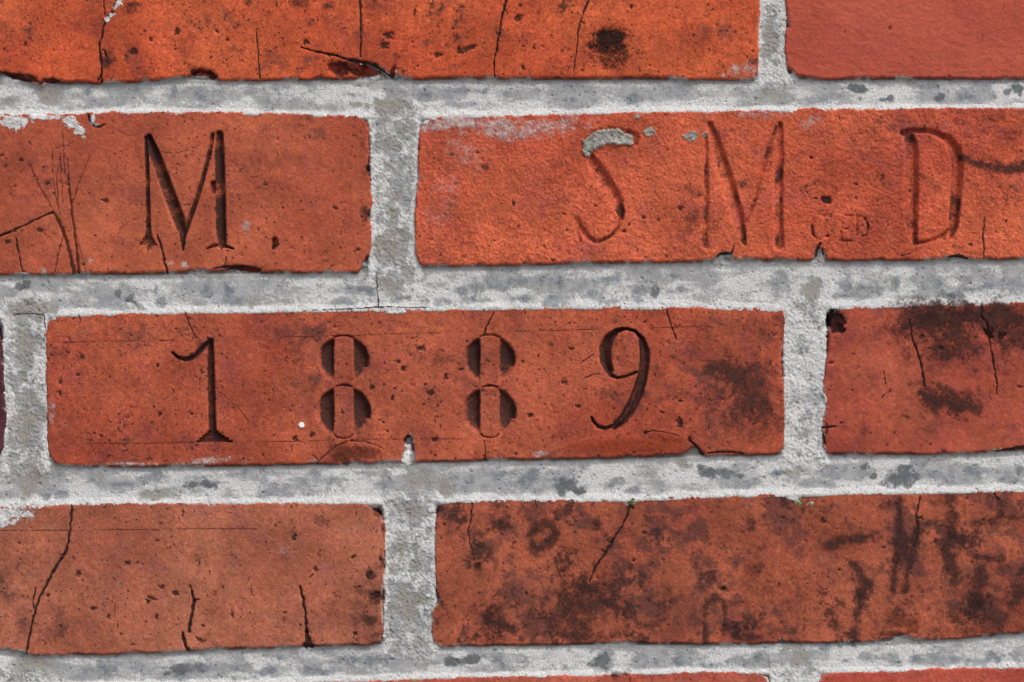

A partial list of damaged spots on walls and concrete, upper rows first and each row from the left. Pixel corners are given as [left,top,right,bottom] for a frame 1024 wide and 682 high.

crack [97,0,117,83]
crack [301,0,391,77]
crack [493,0,508,78]
spalling [825,308,847,333]
damp [704,356,775,424]
crack [25,504,73,654]
crack [181,585,199,651]
crack [299,585,314,649]
damp [825,531,880,550]
damp [848,561,874,646]
damp [861,463,919,593]
damp [940,495,1024,635]